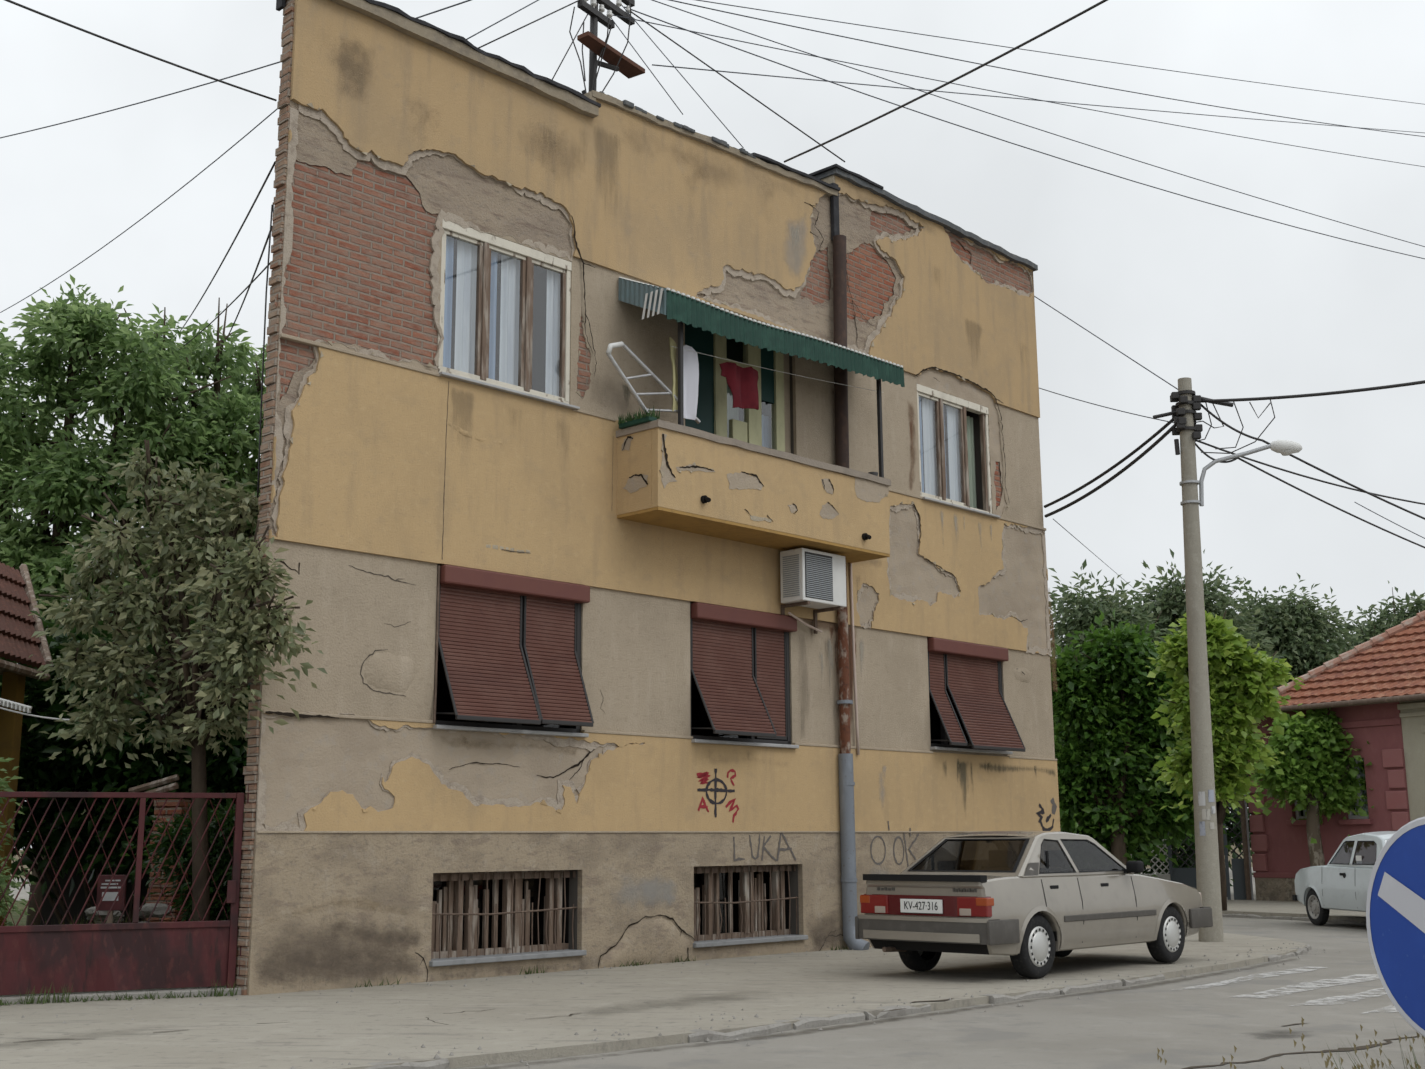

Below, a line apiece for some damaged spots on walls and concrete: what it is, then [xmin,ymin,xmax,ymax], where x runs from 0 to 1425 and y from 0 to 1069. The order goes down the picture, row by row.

spalling [269,100,575,536]
spalling [696,193,925,354]
spalling [944,229,1033,297]
crack [349,565,414,585]
spalling [623,433,764,493]
spalling [820,479,839,519]
spalling [855,477,960,629]
spalling [915,368,1051,656]
crack [360,621,411,696]
corrosion [831,560,856,754]
peeling [255,712,644,836]
crack [598,915,695,966]